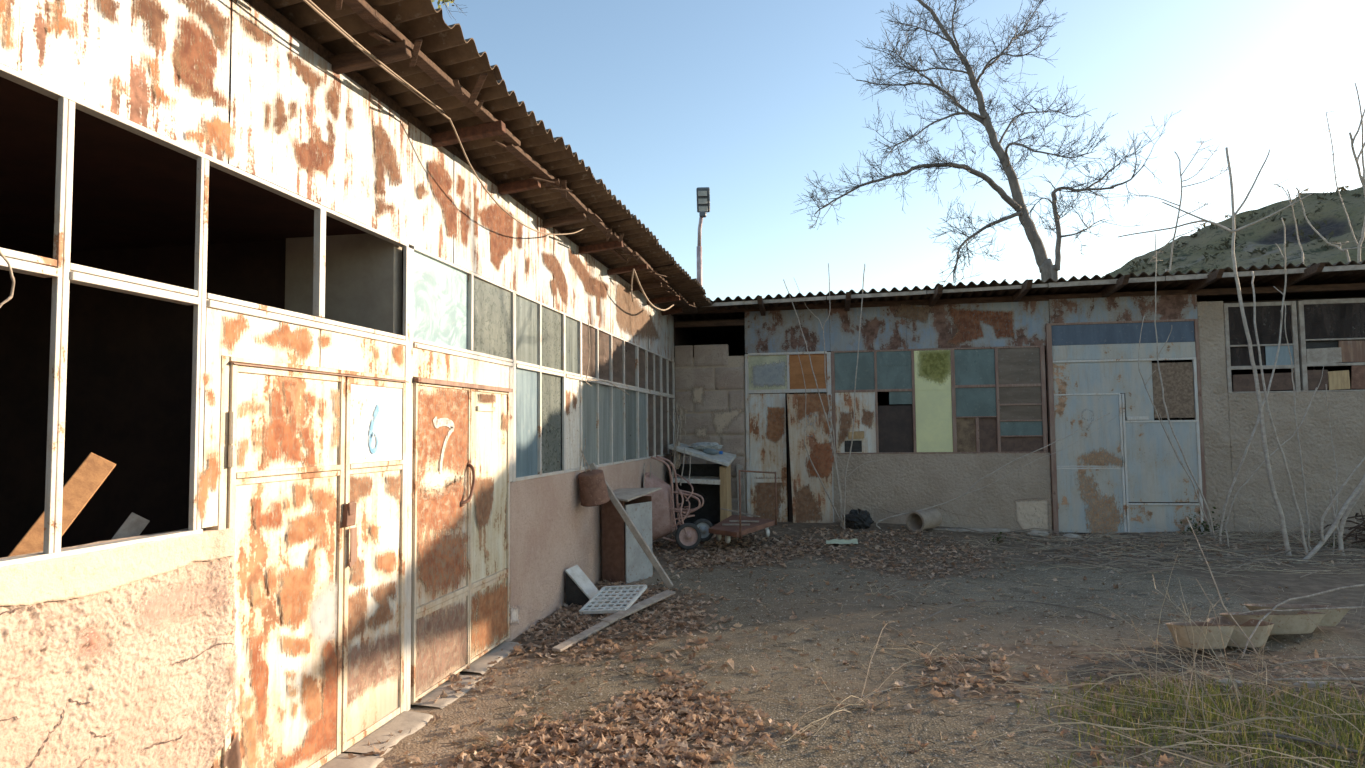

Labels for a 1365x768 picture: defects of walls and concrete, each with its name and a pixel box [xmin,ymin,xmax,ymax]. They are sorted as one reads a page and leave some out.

rust [0,0,19,50]
rust [48,0,77,39]
rust [94,0,273,160]
rust [264,52,354,174]
rust [374,123,402,216]
rust [417,160,659,341]
rust [948,308,1015,345]
rust [203,373,216,407]
rust [196,451,221,518]
rust [753,392,874,523]
rust [238,380,511,768]